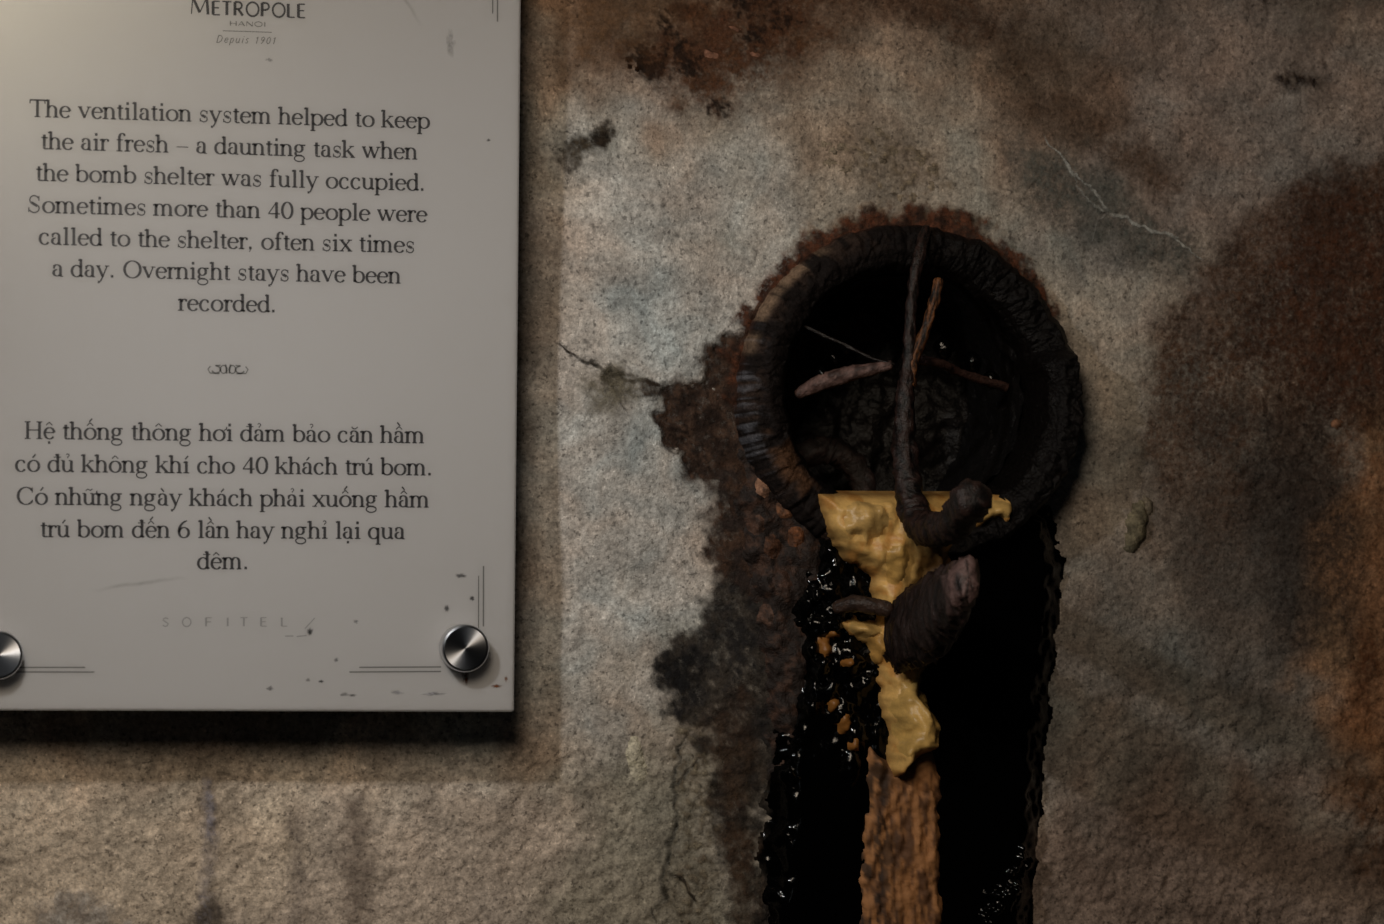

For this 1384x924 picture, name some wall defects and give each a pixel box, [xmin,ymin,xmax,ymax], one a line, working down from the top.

crack [1047,142,1201,259]
crack [559,343,661,407]
corrosion [717,202,1060,409]
damp [851,0,1384,654]
corrosion [732,445,821,781]